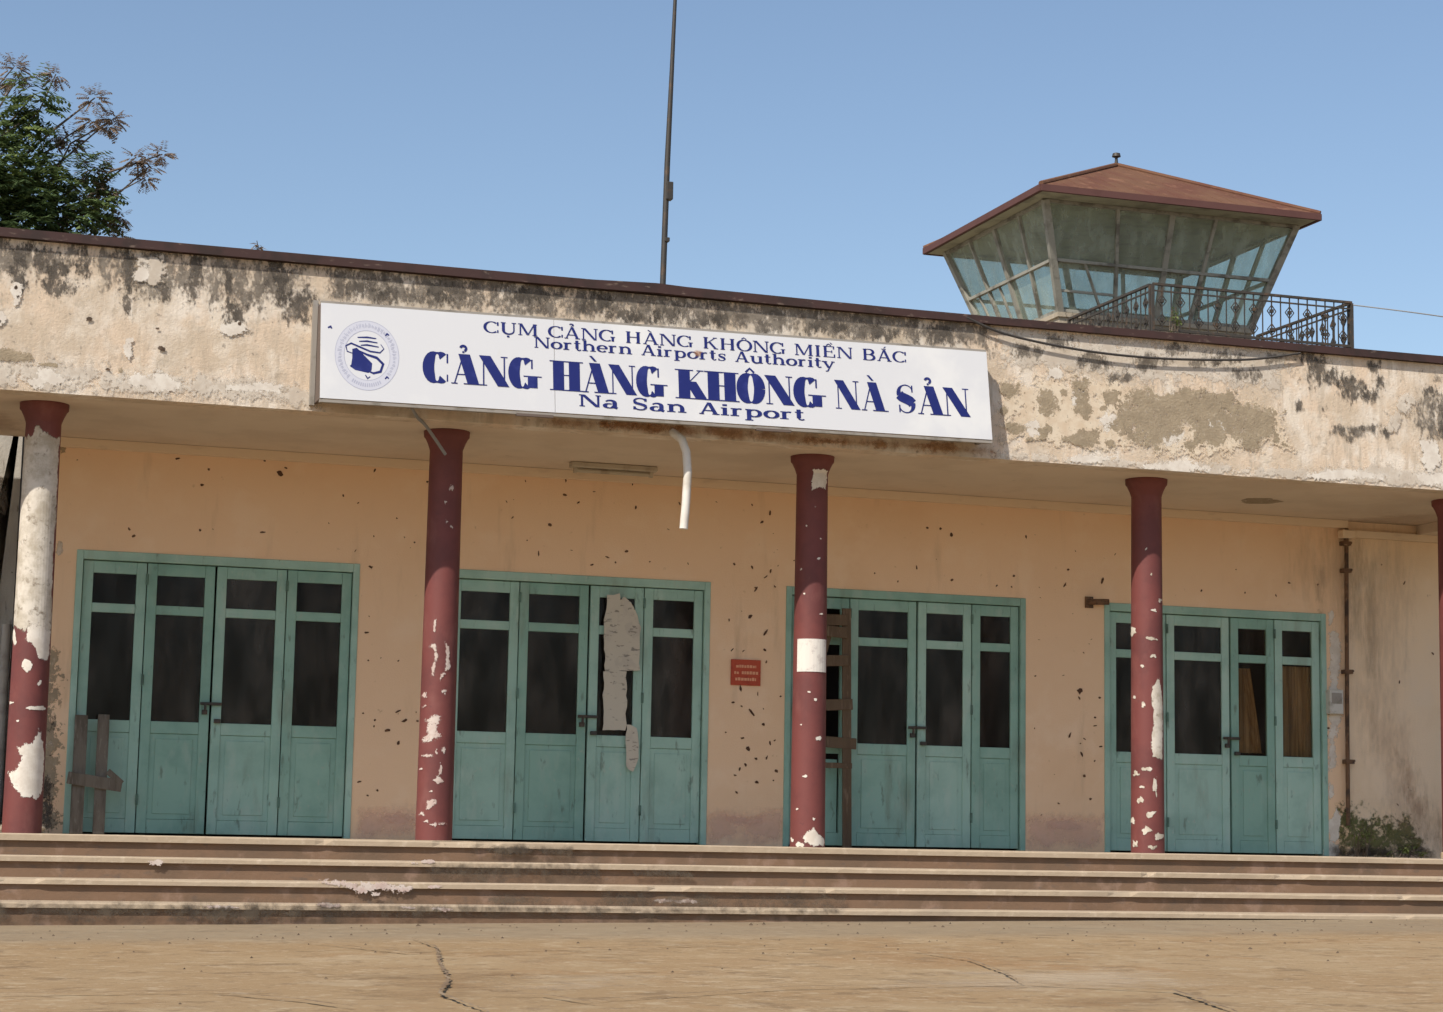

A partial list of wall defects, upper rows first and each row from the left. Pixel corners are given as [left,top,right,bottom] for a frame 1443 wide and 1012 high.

water stain [0,238,1384,411]
water stain [994,450,1443,490]
water stain [1329,423,1390,442]
water stain [1414,376,1443,440]
peeling [7,426,78,829]
water stain [42,775,56,829]
peeling [362,619,451,827]
peeling [1130,678,1164,850]